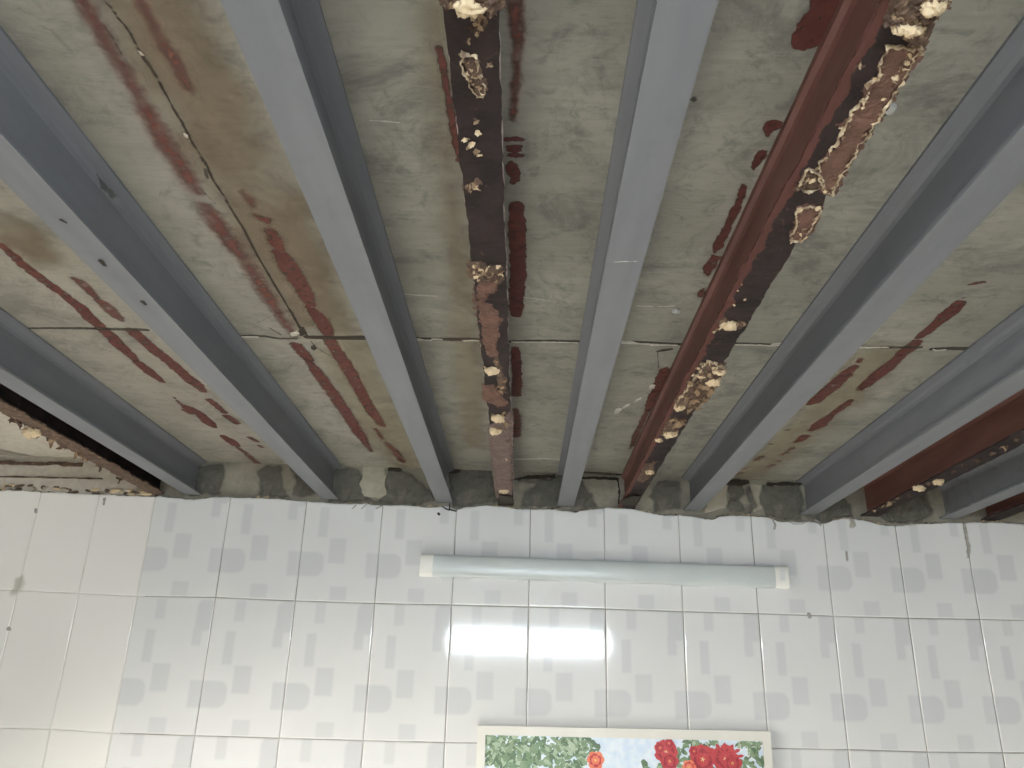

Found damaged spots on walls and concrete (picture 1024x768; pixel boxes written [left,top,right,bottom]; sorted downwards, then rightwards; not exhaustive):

peeling [448,0,493,97]
peeling [838,0,948,137]
crack [106,3,366,358]
crack [29,325,150,333]
crack [416,335,479,343]
crack [509,337,580,345]
crack [633,341,682,368]
peeling [712,320,746,334]
crack [862,344,968,352]
peeling [655,360,726,443]
spalling [0,477,159,497]
peeling [832,459,976,526]